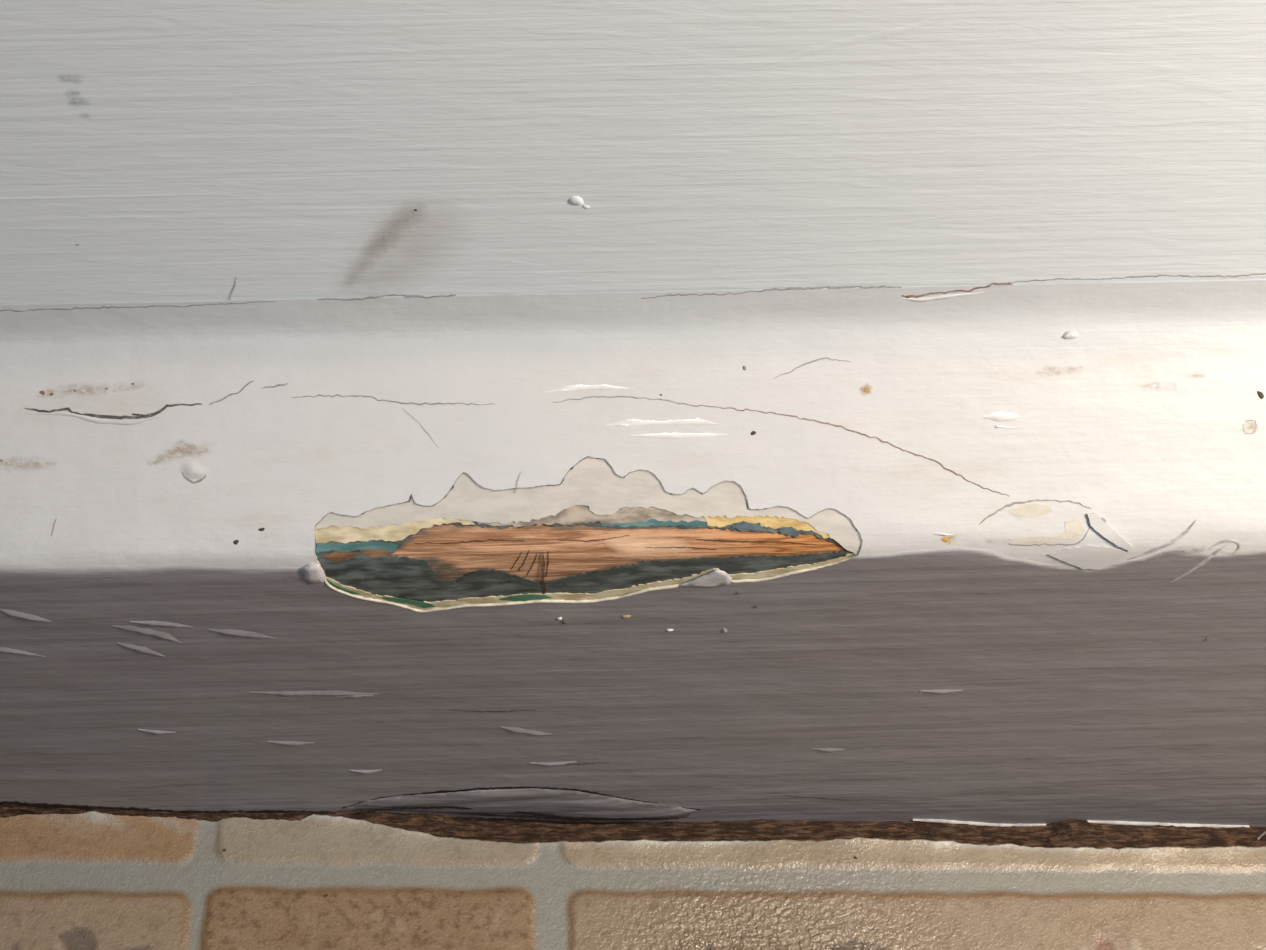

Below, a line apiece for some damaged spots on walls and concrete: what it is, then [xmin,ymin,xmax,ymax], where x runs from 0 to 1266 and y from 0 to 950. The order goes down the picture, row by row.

crack [25,403,202,425]
crack [688,404,1009,496]
peeling [302,456,862,613]